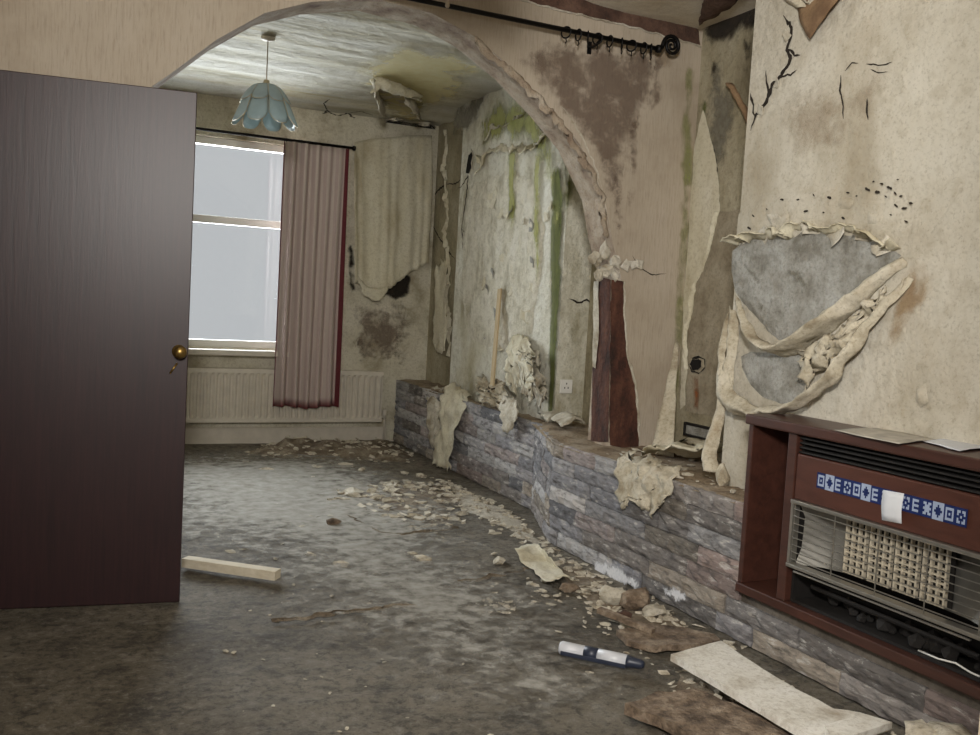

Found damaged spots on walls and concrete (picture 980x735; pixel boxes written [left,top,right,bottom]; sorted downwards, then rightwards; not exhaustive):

peeling [374,79,423,108]
flaking render [474,36,609,238]
damp [536,48,659,189]
peeling [725,83,748,123]
crack [750,15,799,128]
crack [839,62,891,119]
peeling [460,149,552,352]
flaking render [680,111,901,421]
damp [358,313,405,357]